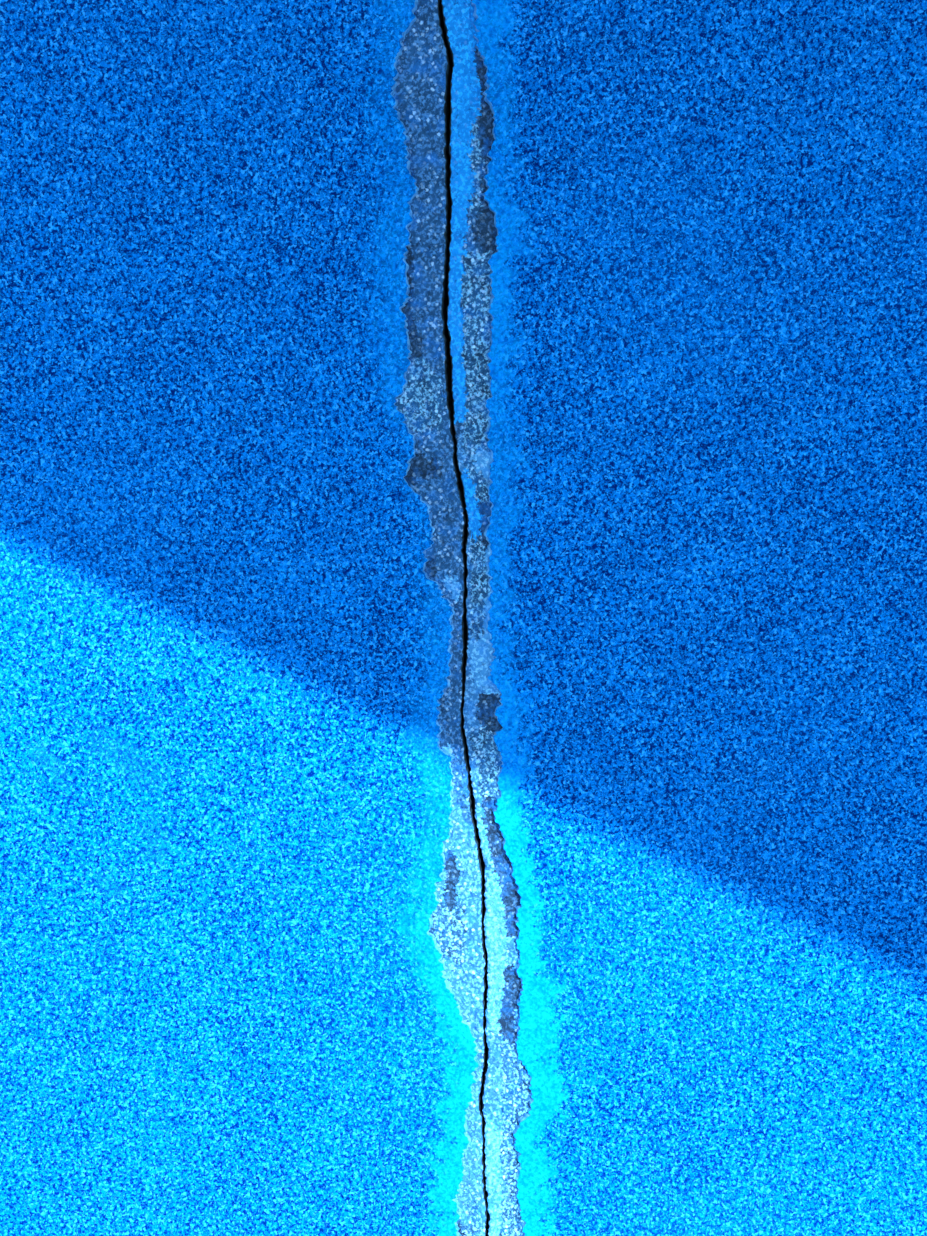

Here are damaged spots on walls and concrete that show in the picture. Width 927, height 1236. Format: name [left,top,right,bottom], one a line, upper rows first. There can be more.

spalling [390,0,534,1236]
crack [438,0,491,1236]